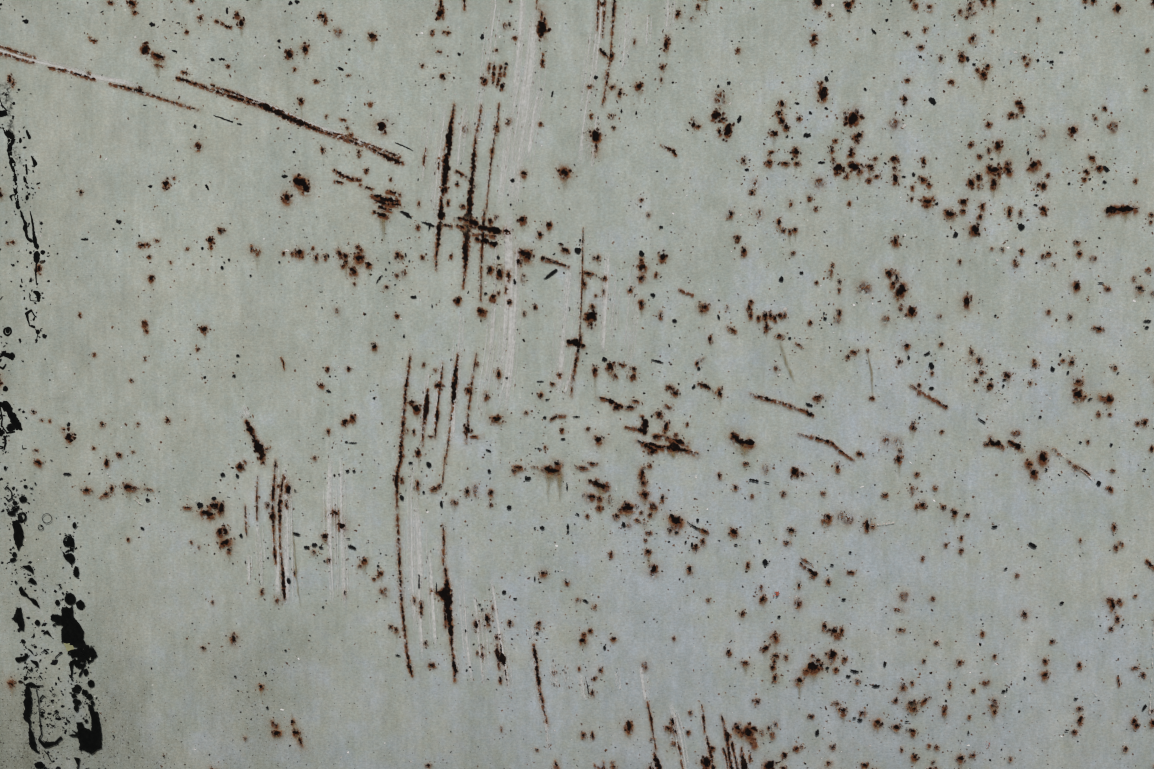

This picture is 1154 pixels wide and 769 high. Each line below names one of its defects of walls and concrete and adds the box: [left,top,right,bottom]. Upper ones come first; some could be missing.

corrosion [84,0,153,44]
peeling [0,89,45,302]
corrosion [139,0,769,698]
peeling [0,386,25,450]
peeling [6,482,36,562]
peeling [62,522,79,577]
corrosion [712,432,894,534]
corrosion [801,434,915,473]
corrosion [857,472,981,555]
corrosion [976,413,1125,494]
corrosion [1098,585,1153,652]
peeling [12,580,102,769]